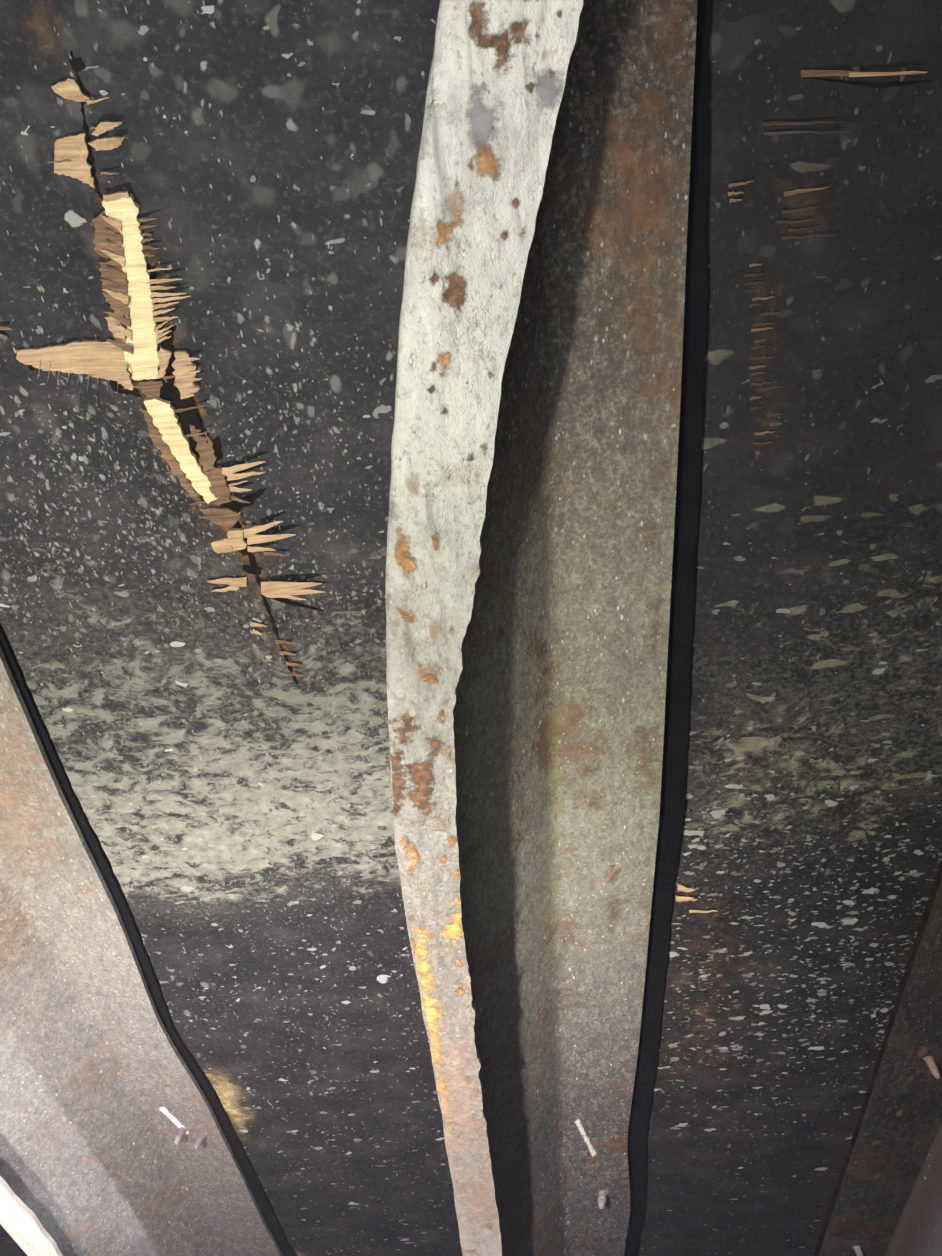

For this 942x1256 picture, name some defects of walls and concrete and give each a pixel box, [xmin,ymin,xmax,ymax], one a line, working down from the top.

rust [469,3,538,71]
rust [468,147,500,181]
rust [435,211,464,245]
rust [430,273,467,311]
crack [0,51,326,689]
rust [427,352,450,394]
rust [395,529,416,579]